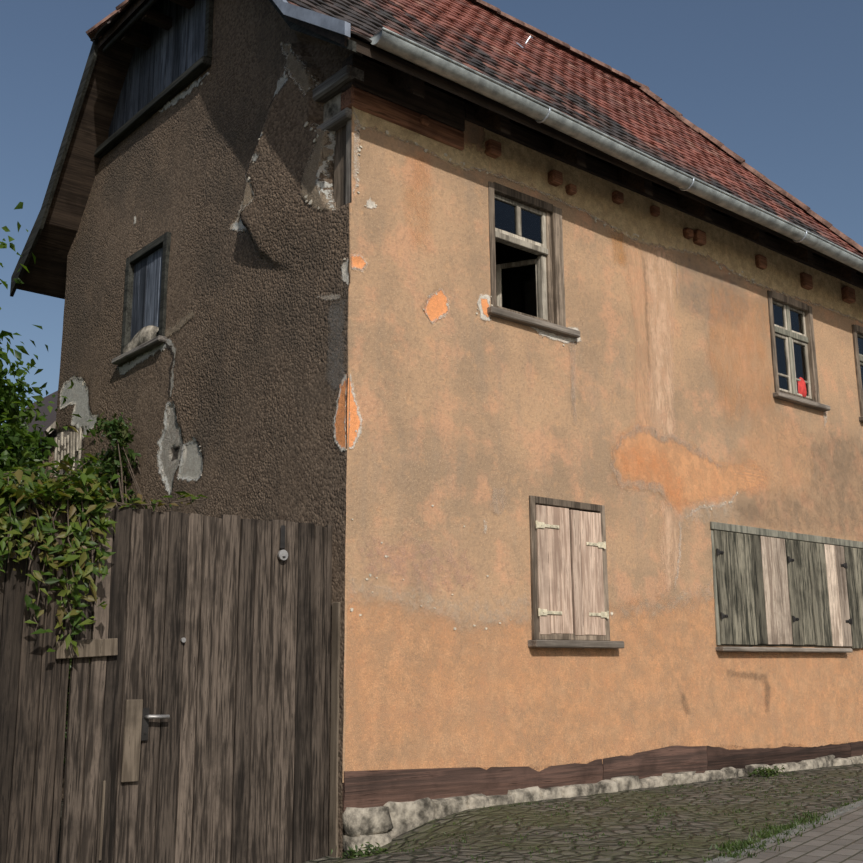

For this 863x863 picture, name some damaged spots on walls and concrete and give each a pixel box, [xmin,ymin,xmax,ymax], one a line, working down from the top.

spalling [273,43,321,97]
spalling [230,175,254,232]
spalling [301,122,336,211]
crack [164,342,178,398]
spalling [54,376,98,477]
spalling [157,402,203,495]
spalling [333,373,362,451]